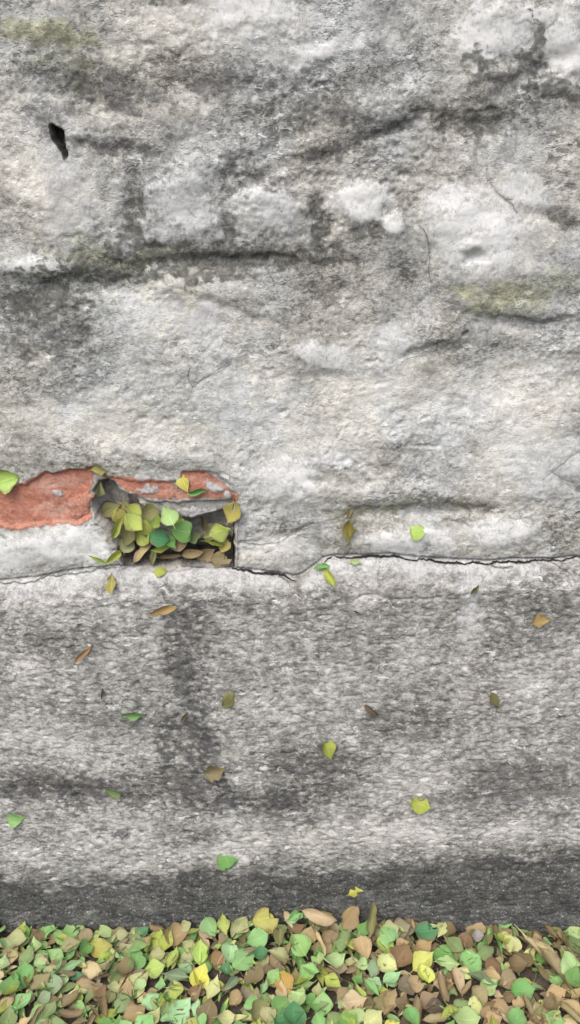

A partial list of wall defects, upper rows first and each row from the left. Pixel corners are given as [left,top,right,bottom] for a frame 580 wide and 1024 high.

spalling [48,124,69,160]
crack [0,564,116,584]
spalling [0,442,355,575]
crack [232,499,580,585]
damp [0,844,580,935]